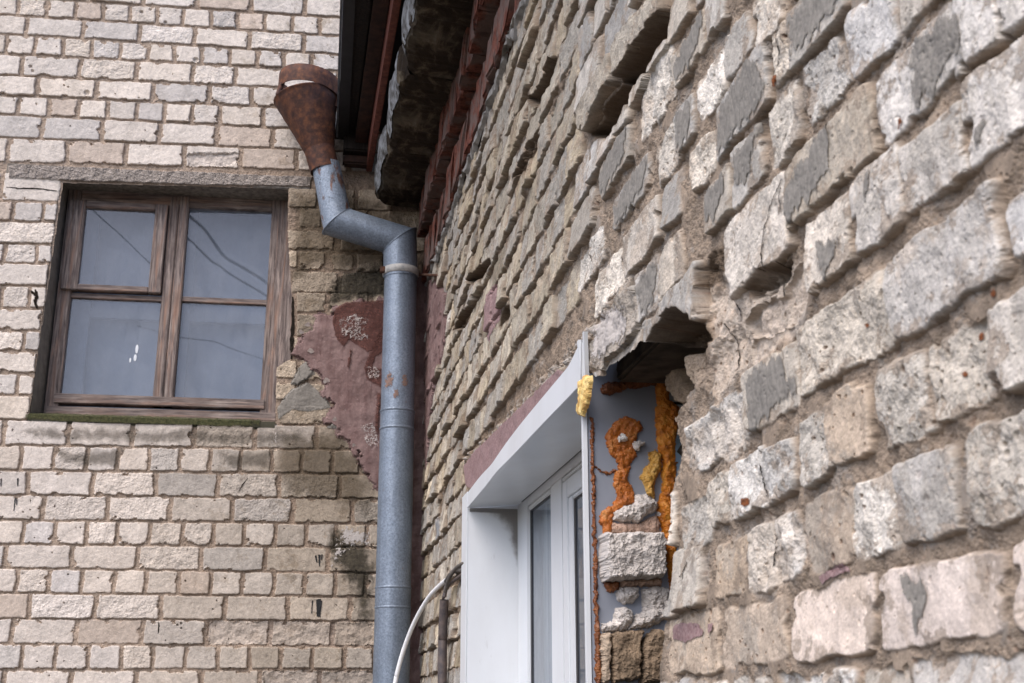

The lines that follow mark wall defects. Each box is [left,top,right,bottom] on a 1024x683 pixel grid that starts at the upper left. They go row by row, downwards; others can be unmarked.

leakage [333,300,384,447]
leakage [315,526,371,567]
peeling [291,269,447,683]